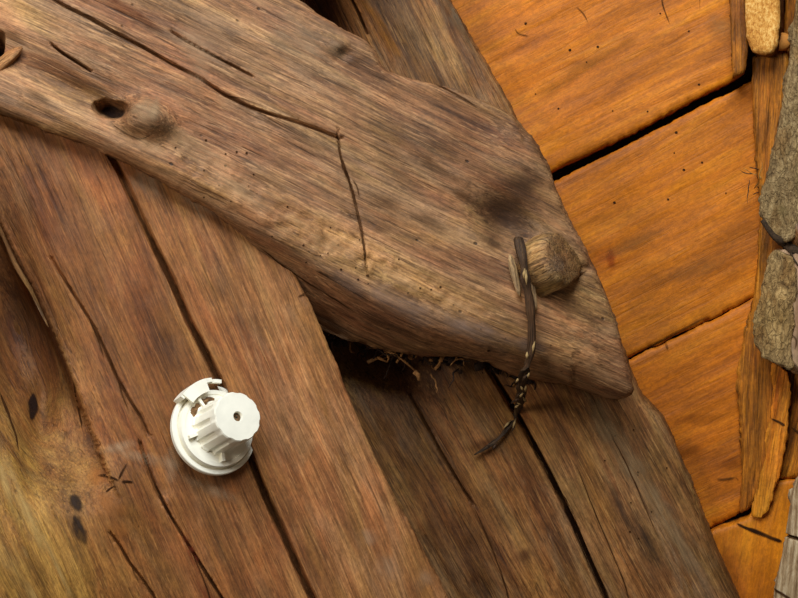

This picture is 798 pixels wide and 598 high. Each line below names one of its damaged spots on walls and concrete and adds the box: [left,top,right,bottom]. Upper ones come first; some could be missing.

crack [338,142,366,264]
crack [128,192,224,388]
crack [90,321,136,410]
crack [99,465,132,492]
crack [146,462,223,598]
crack [248,456,313,598]
crack [484,362,607,598]
crack [580,474,629,598]